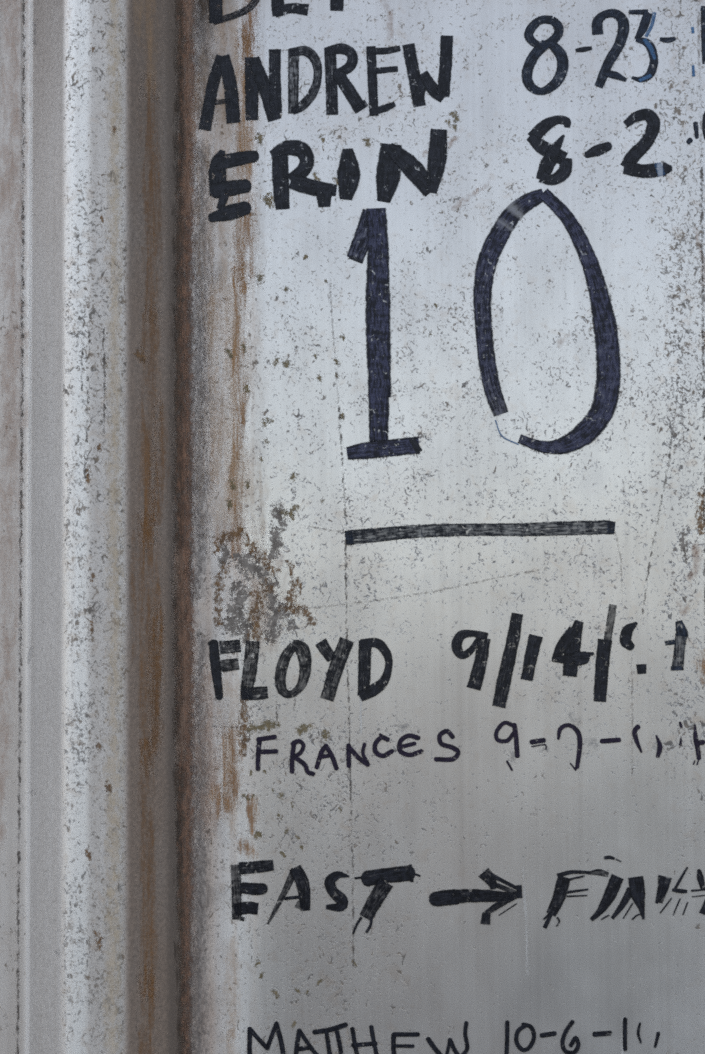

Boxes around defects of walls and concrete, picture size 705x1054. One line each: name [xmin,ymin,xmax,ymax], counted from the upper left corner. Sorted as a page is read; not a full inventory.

corrosion [238,0,264,179]
corrosion [209,213,317,645]
corrosion [175,0,198,1054]
corrosion [212,700,280,854]
corrosion [295,723,331,741]